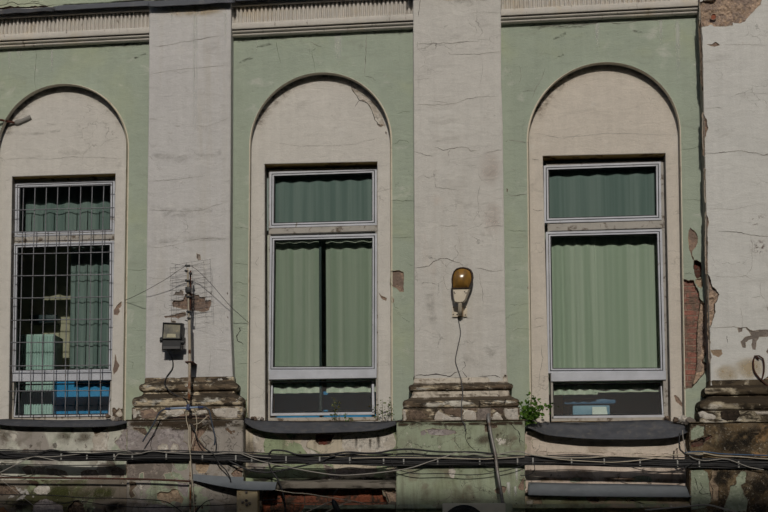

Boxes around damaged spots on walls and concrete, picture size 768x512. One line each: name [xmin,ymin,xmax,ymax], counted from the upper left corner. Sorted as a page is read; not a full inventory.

flaking render [698,0,762,91]
crack [336,37,381,146]
crack [400,41,501,113]
flaking render [164,289,211,323]
flaking render [379,270,404,302]
flaking render [681,228,723,389]
flaking render [737,327,768,350]
flaking render [21,465,85,512]
flaking render [80,469,99,477]
flaking render [91,407,237,512]
flaking render [261,489,396,512]
flaking render [690,468,748,512]